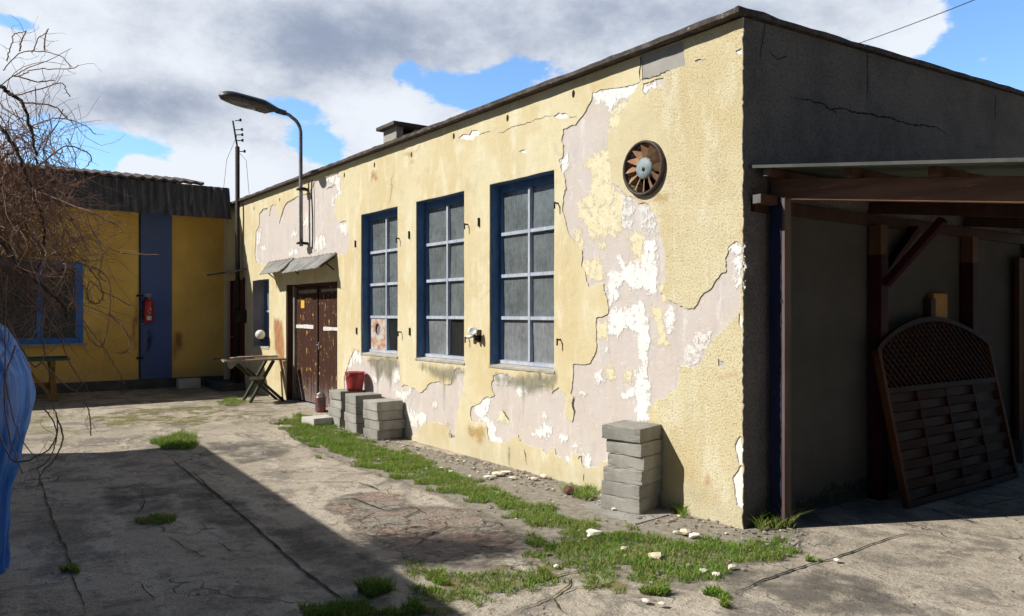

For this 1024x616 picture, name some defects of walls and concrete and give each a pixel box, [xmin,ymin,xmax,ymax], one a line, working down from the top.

crack [795,52,948,137]
peeling [255,173,350,264]
peeling [344,78,747,468]
peeling [733,436,744,507]